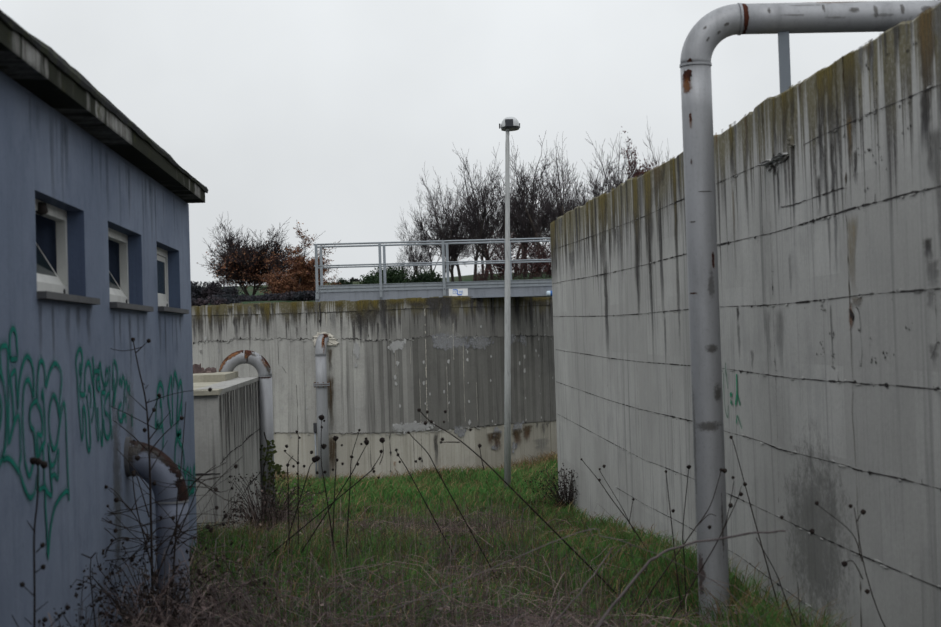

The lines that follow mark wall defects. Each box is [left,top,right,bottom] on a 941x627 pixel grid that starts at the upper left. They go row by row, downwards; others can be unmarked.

water stain [757,81,801,149]
water stain [816,2,941,238]
water stain [777,148,794,203]
water stain [551,155,683,342]
water stain [193,303,272,333]
water stain [357,297,495,333]
water stain [515,297,553,326]
corrosion [219,350,271,378]
corrosion [128,440,189,501]